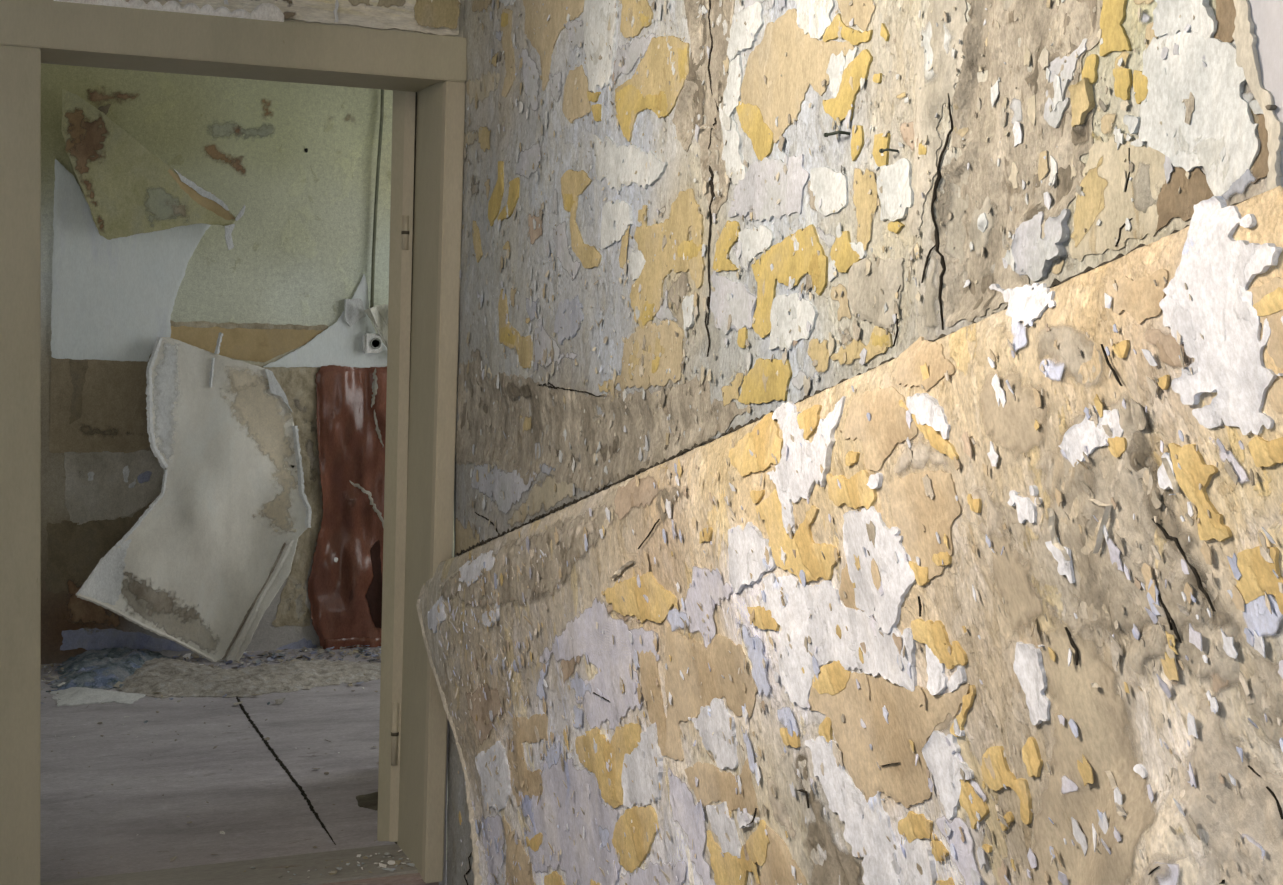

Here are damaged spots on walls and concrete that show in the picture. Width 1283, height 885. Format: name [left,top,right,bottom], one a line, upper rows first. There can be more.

crack [705,0,719,357]
crack [893,93,953,347]
peeling [44,358,190,652]
spalling [255,364,322,650]
crack [537,382,603,397]
spalling [436,0,1283,885]
crack [236,696,336,845]